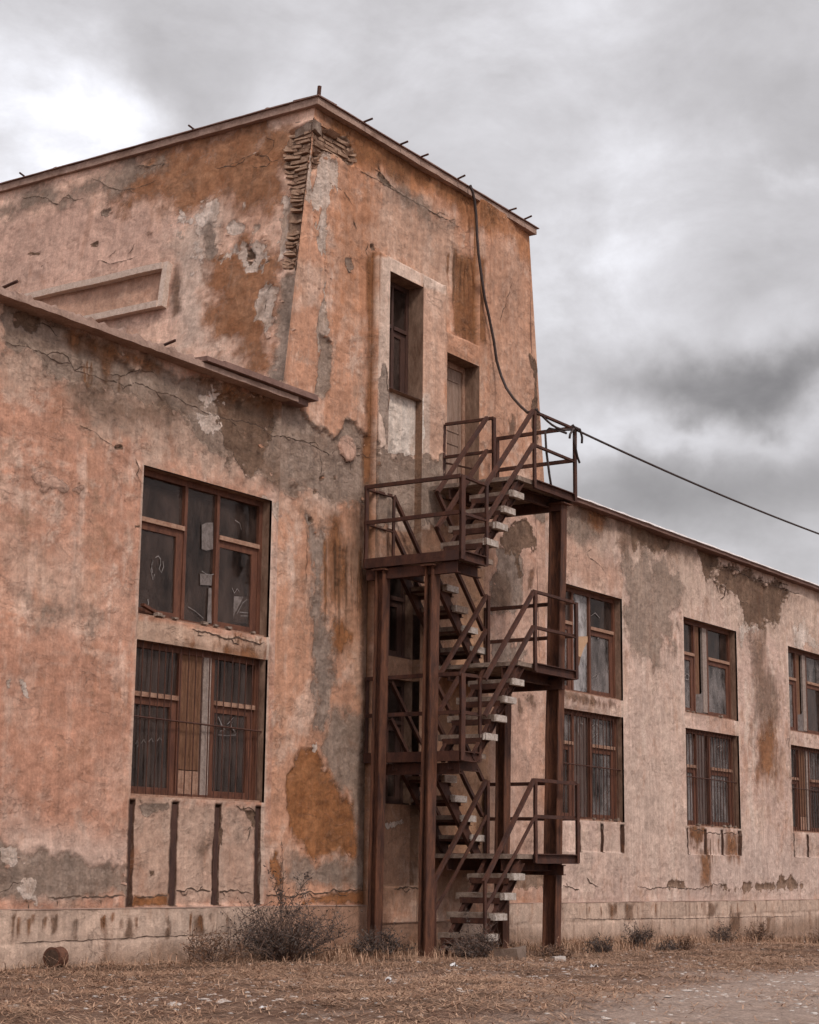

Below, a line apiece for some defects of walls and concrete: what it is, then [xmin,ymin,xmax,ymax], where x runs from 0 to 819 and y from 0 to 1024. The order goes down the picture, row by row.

crack [355,166,461,229]
flaking render [197,120,357,399]
crack [7,322,369,474]
water stain [194,384,225,434]
flaking render [0,304,448,532]
flaking render [490,518,536,614]
flaking render [697,550,789,629]
peeling [270,512,365,889]
water stain [0,840,127,933]
crack [563,878,802,920]